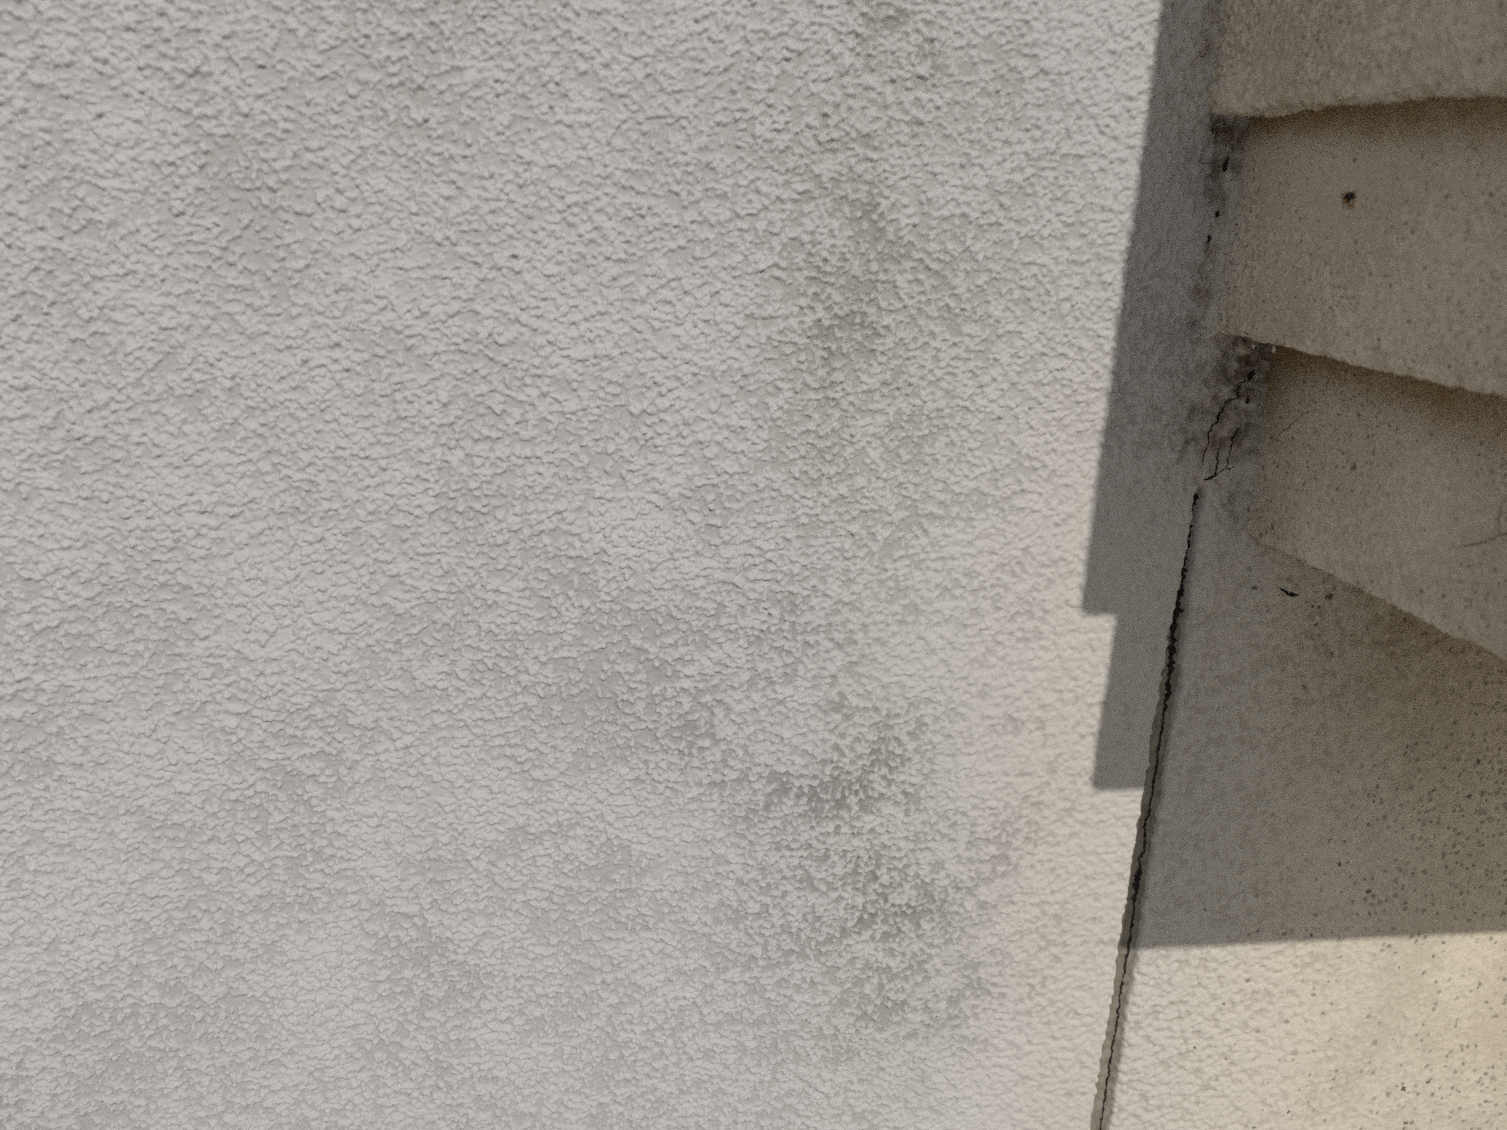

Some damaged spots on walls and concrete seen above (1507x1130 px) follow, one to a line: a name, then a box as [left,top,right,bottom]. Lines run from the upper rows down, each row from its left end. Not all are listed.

crack [1100,379,1249,1130]